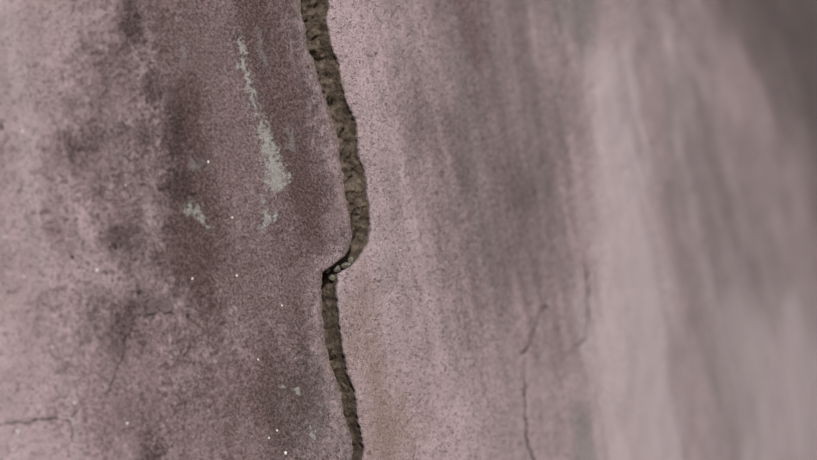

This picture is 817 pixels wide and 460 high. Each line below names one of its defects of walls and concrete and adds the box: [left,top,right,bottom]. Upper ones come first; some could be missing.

crack [0,323,132,440]
crack [300,0,369,460]